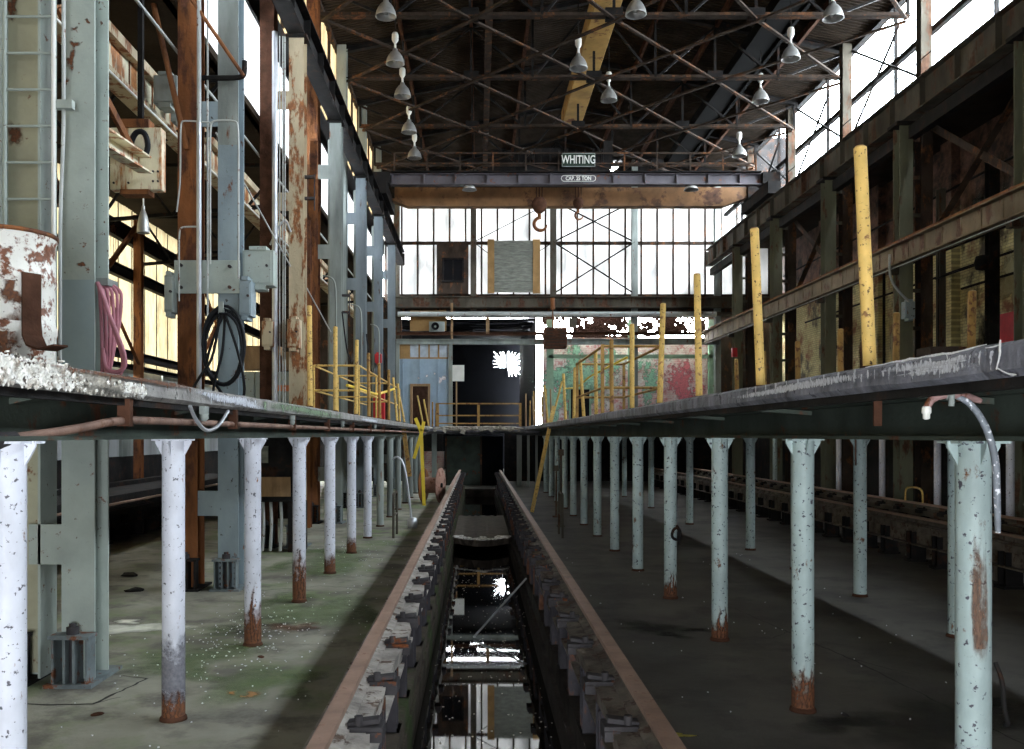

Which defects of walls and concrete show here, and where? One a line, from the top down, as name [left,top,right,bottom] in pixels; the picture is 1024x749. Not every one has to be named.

peeling [536,345,705,422]
rust [292,551,306,600]
rust [324,555,335,572]
rust [244,589,316,644]
rust [711,611,728,639]
rust [971,552,988,652]
rust [161,692,185,718]
rust [791,670,815,709]